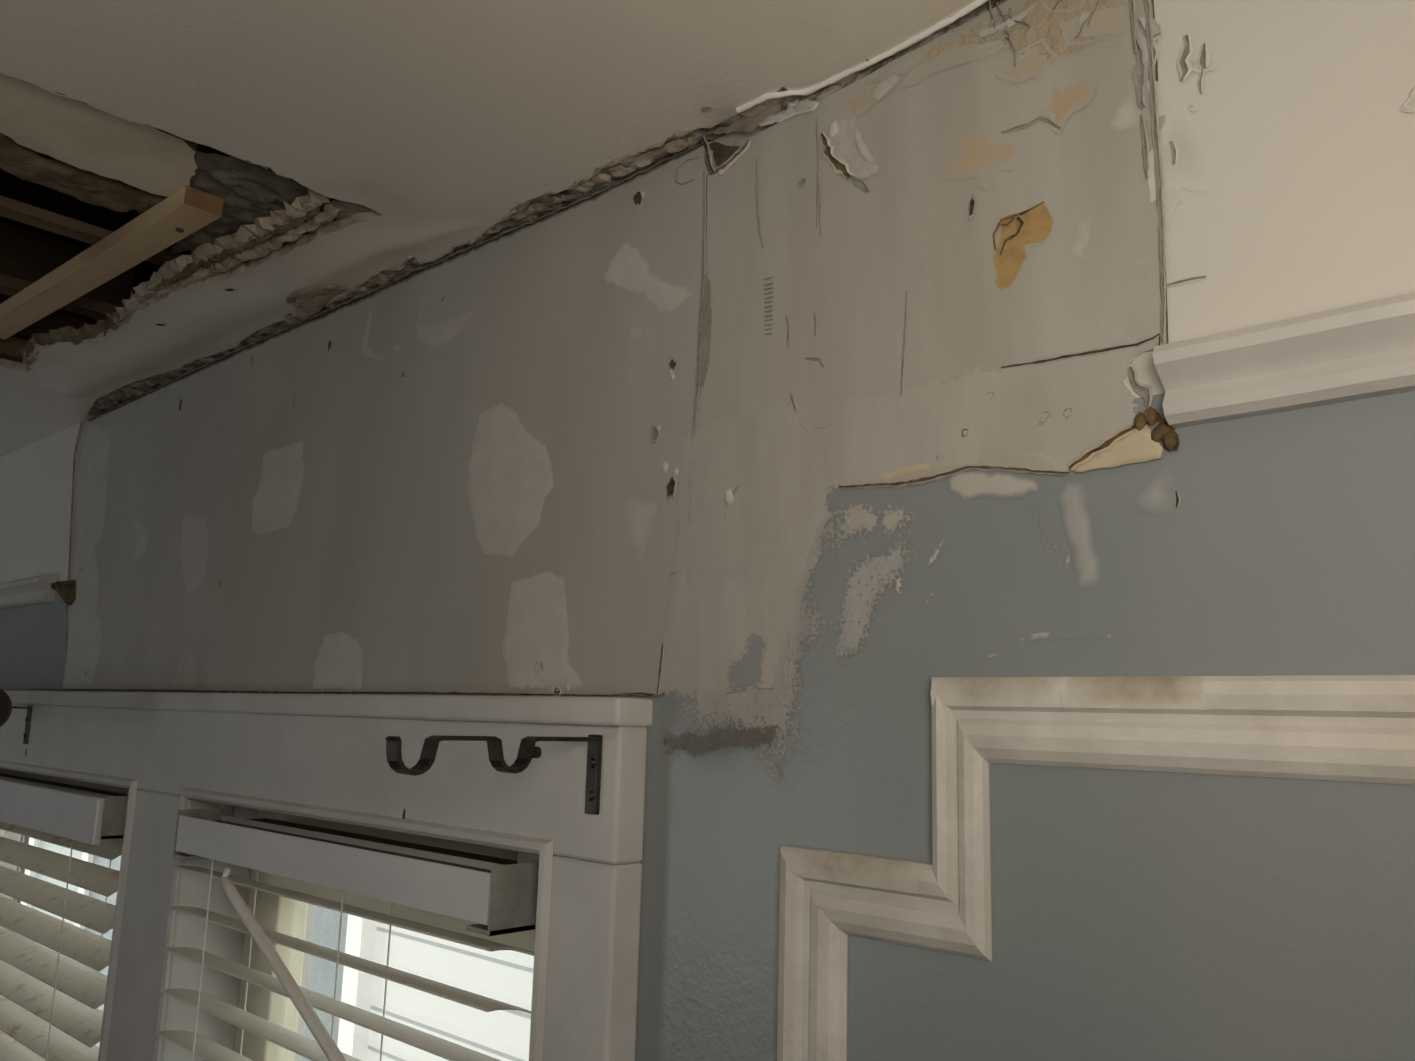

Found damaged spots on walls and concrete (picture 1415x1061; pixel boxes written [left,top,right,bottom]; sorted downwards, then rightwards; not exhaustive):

spalling [0,135,168,215]
spalling [20,189,341,373]
spalling [83,0,1007,422]
crack [689,170,741,522]
flaking render [656,334,1180,701]
water stain [991,200,1055,293]
crack [1001,0,1206,407]